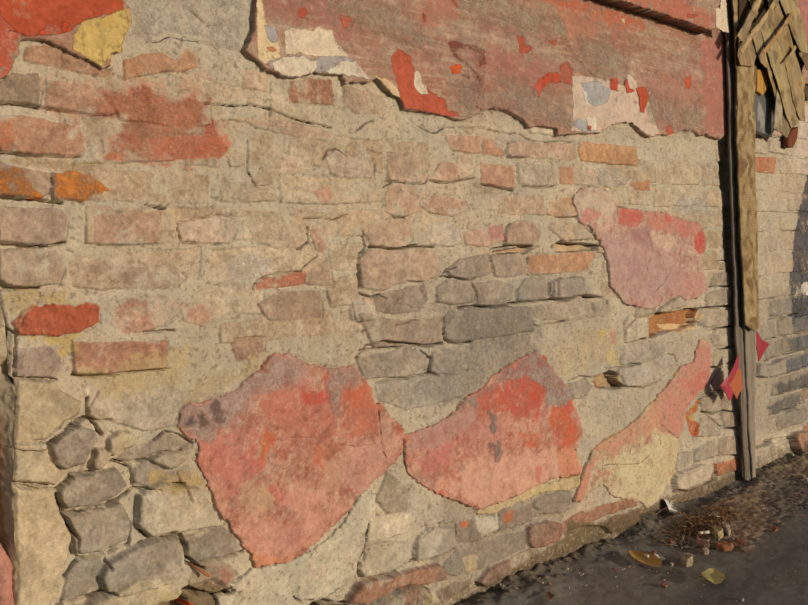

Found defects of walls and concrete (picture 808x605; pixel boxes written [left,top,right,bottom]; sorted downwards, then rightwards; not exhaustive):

flaking render [0,0,460,117]
peeling [517,35,531,53]
peeling [532,62,674,136]
flaking render [551,186,708,336]
spalling [21,303,99,337]
flaking render [157,339,712,605]